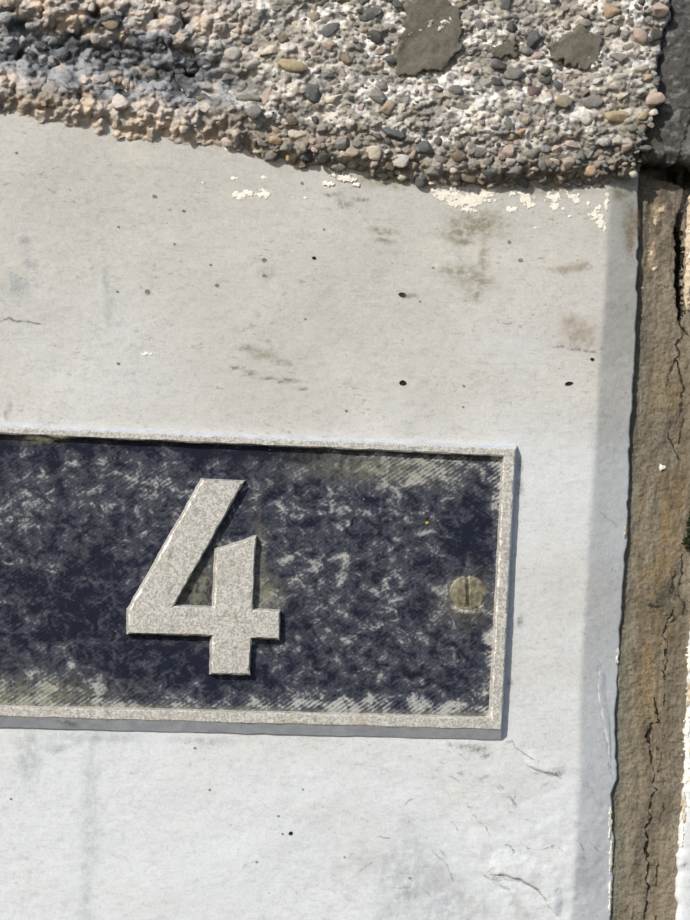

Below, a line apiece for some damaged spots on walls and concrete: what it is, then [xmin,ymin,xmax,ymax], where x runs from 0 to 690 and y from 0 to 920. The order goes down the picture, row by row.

peeling [431,184,497,213]
peeling [506,190,611,232]
crack [666,106,690,460]
crack [643,554,686,920]